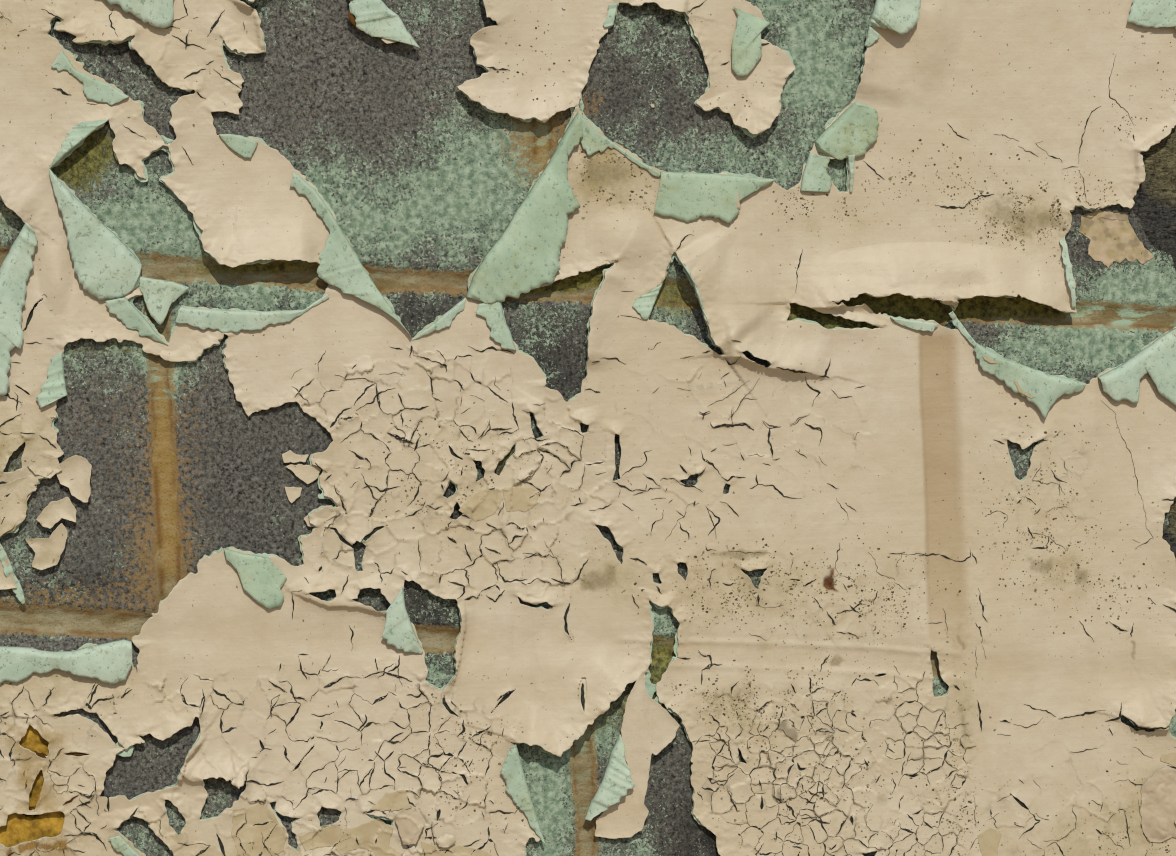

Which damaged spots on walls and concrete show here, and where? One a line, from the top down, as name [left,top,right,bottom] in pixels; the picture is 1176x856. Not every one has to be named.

crack [0,298,72,480]
peeling [0,0,921,698]
crack [291,291,864,635]
peeling [787,125,1176,419]
crack [986,434,1067,549]
peeling [54,709,200,835]
peeling [108,816,174,856]
crack [0,626,519,856]
peeling [200,777,411,856]
crack [579,683,587,710]
peeling [500,601,720,856]
crack [678,543,1176,856]